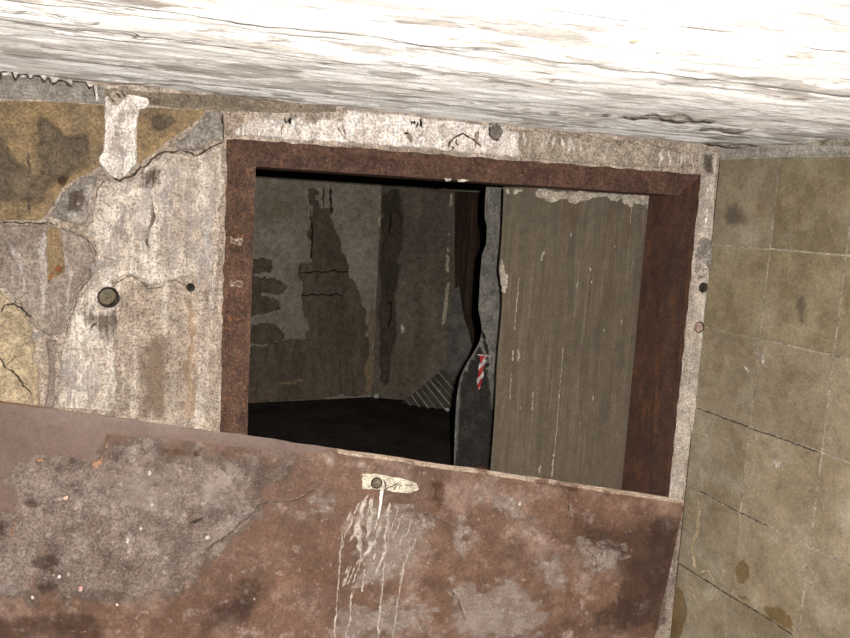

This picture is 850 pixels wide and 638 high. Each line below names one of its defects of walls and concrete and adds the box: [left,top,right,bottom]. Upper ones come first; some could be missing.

damp [0,119,89,213]
crack [96,83,288,198]
damp [379,189,403,385]
crack [0,356,32,395]
peeling [0,176,336,609]
crack [686,405,820,453]
crack [678,563,792,635]